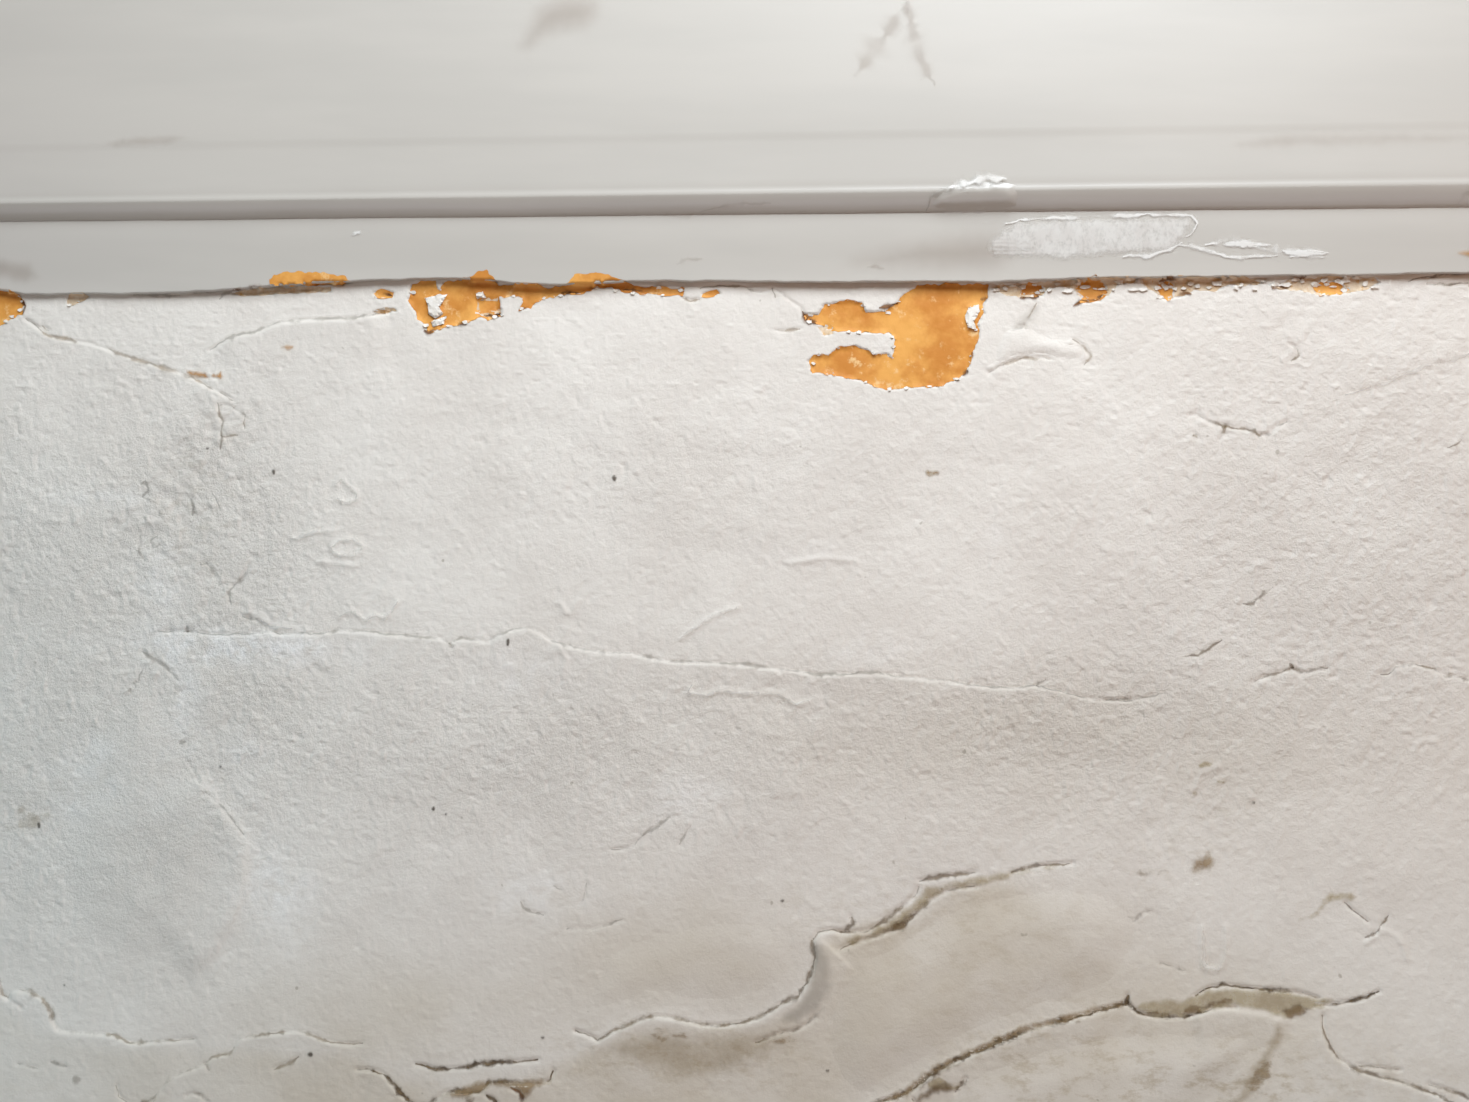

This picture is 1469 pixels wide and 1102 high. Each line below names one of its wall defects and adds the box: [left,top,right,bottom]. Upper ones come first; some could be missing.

peeling [0,289,26,326]
peeling [234,271,349,297]
peeling [374,270,685,334]
peeling [802,275,1379,391]
crack [721,873,973,1043]
crack [1056,983,1275,1024]
crack [1322,991,1380,1076]
crack [371,1059,553,1102]
crack [878,1032,1022,1102]